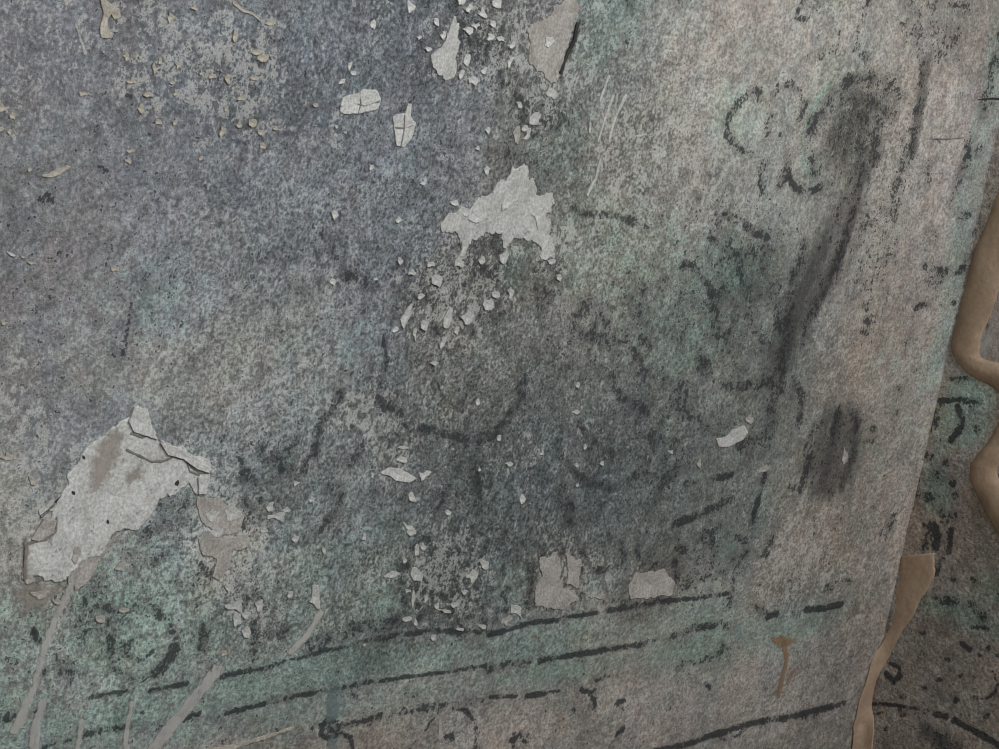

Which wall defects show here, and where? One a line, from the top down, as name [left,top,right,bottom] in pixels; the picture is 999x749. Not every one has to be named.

flaking render [417,0,515,86]
flaking render [526,0,580,99]
flaking render [339,89,381,114]
flaking render [392,103,416,147]
flaking render [513,102,541,145]
flaking render [440,164,562,281]
peeling [391,293,429,341]
peeling [438,288,514,349]
flaking render [21,404,263,639]
flaking render [534,552,608,610]
flaking render [628,568,675,599]
rust [772,635,796,698]